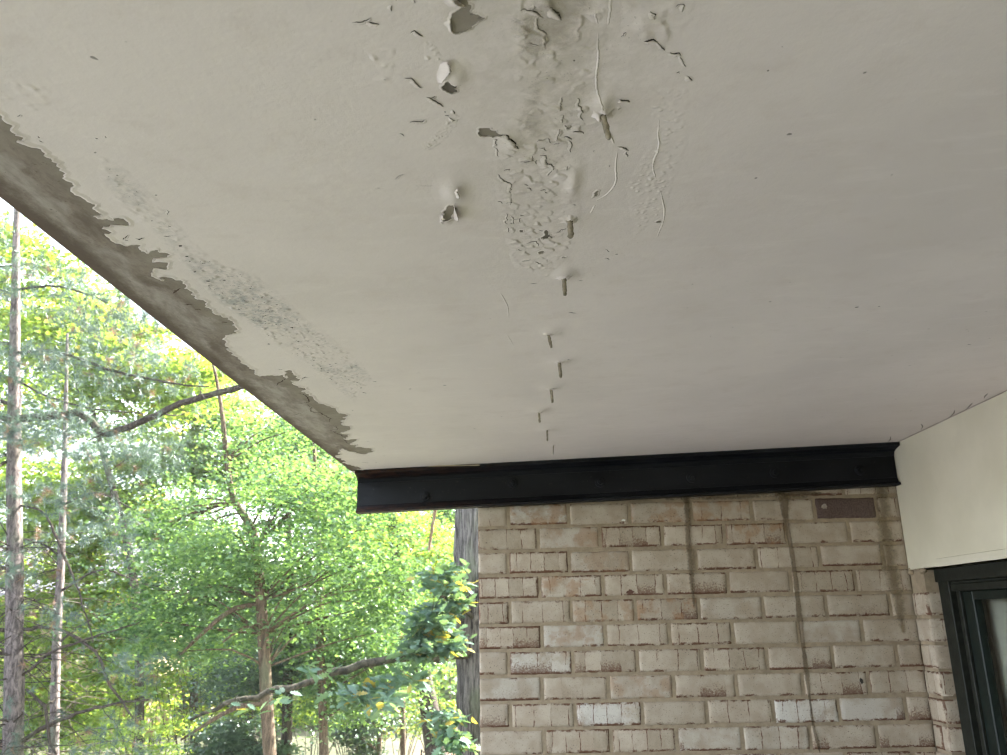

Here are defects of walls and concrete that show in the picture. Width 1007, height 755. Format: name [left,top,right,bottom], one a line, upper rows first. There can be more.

peeling [437,62,461,95]
peeling [442,0,488,35]
crack [621,4,693,82]
peeling [439,189,460,226]
crack [492,97,584,284]
peeling [0,110,376,471]
damp [666,491,821,752]